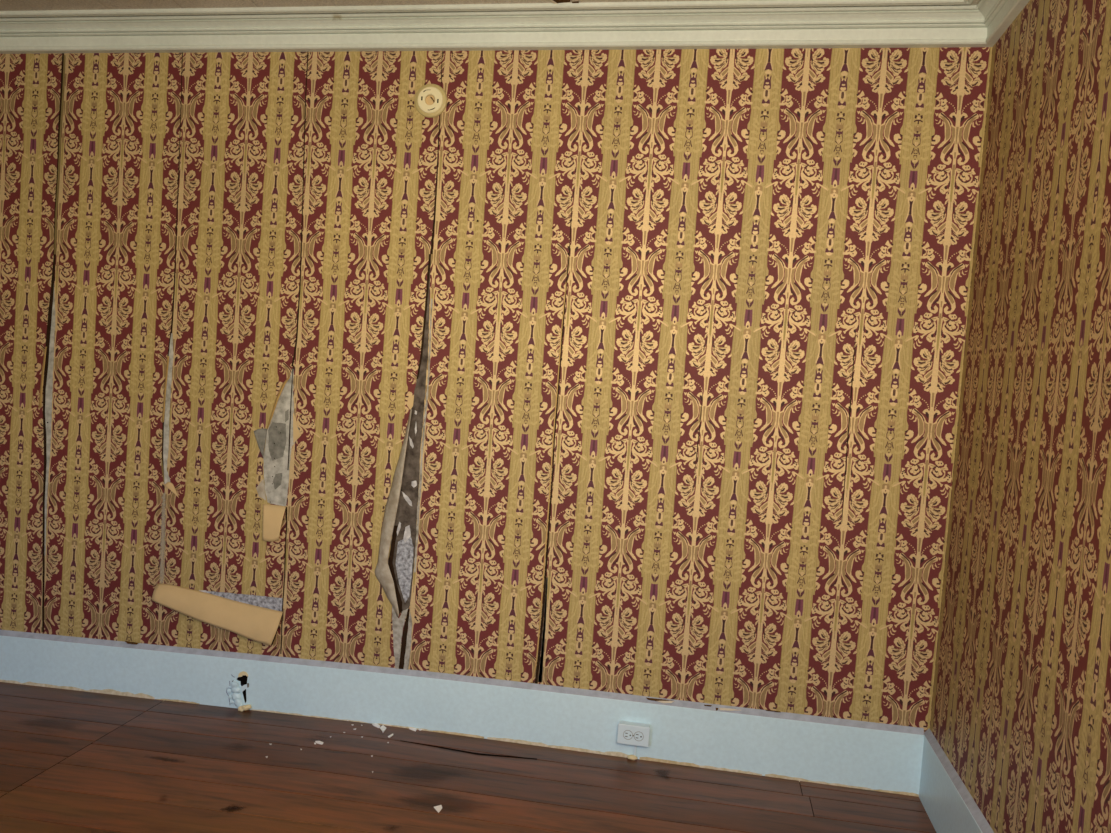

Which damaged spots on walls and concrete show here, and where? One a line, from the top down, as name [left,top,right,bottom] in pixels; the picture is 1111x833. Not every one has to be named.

peeling [152,51,308,654]
peeling [374,115,440,670]
peeling [0,680,199,704]
peeling [226,671,919,797]